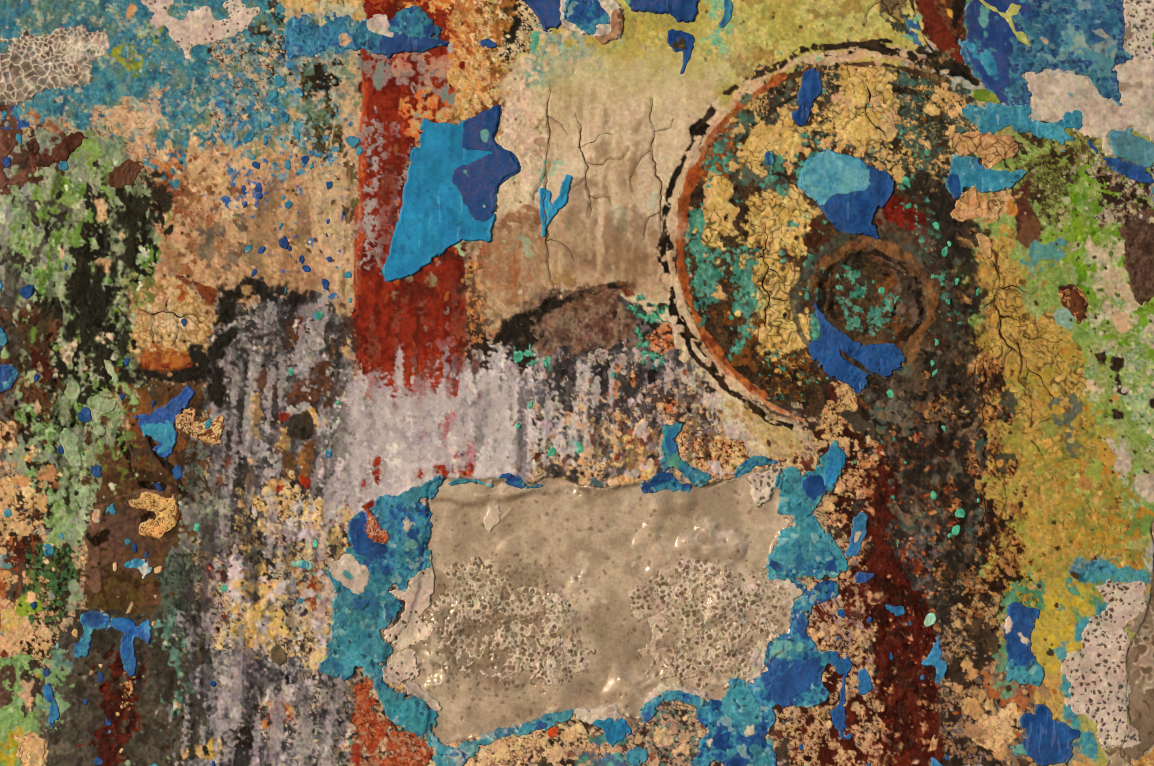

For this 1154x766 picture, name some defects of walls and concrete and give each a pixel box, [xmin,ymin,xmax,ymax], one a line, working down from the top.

crack [843,81,887,138]
peeling [945,0,1154,222]
crack [533,89,672,289]
damp [499,292,583,345]
crack [750,226,790,329]
peeling [976,233,992,259]
peeling [1124,215,1154,306]
damp [345,375,516,500]
damp [189,517,216,629]
damp [237,519,271,620]
spalling [291,422,874,766]
rust [848,466,944,766]